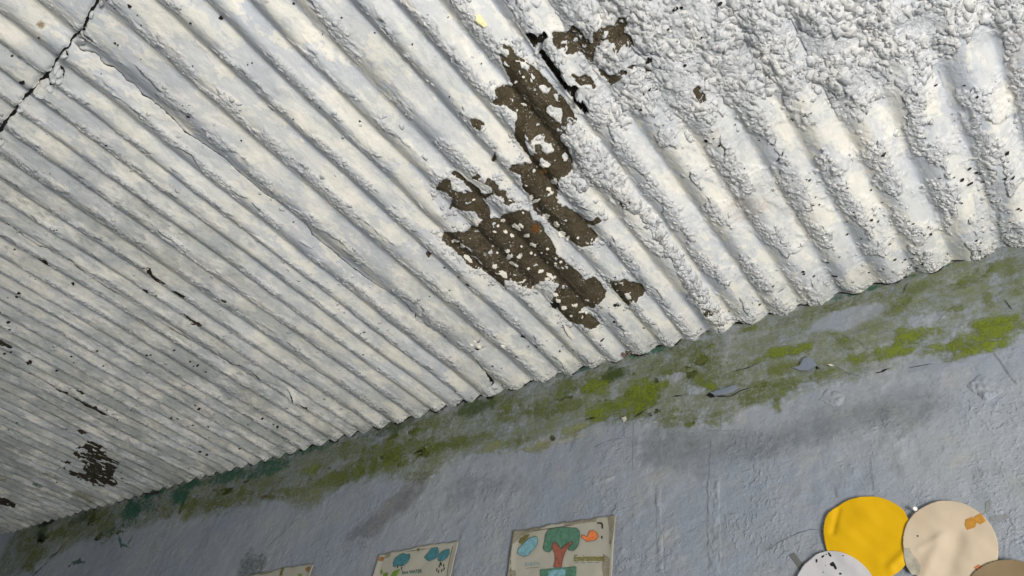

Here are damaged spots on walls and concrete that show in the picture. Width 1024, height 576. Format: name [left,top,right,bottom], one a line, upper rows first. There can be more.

crack [0,0,271,197]
peeling [426,0,1024,352]
peeling [56,429,127,487]